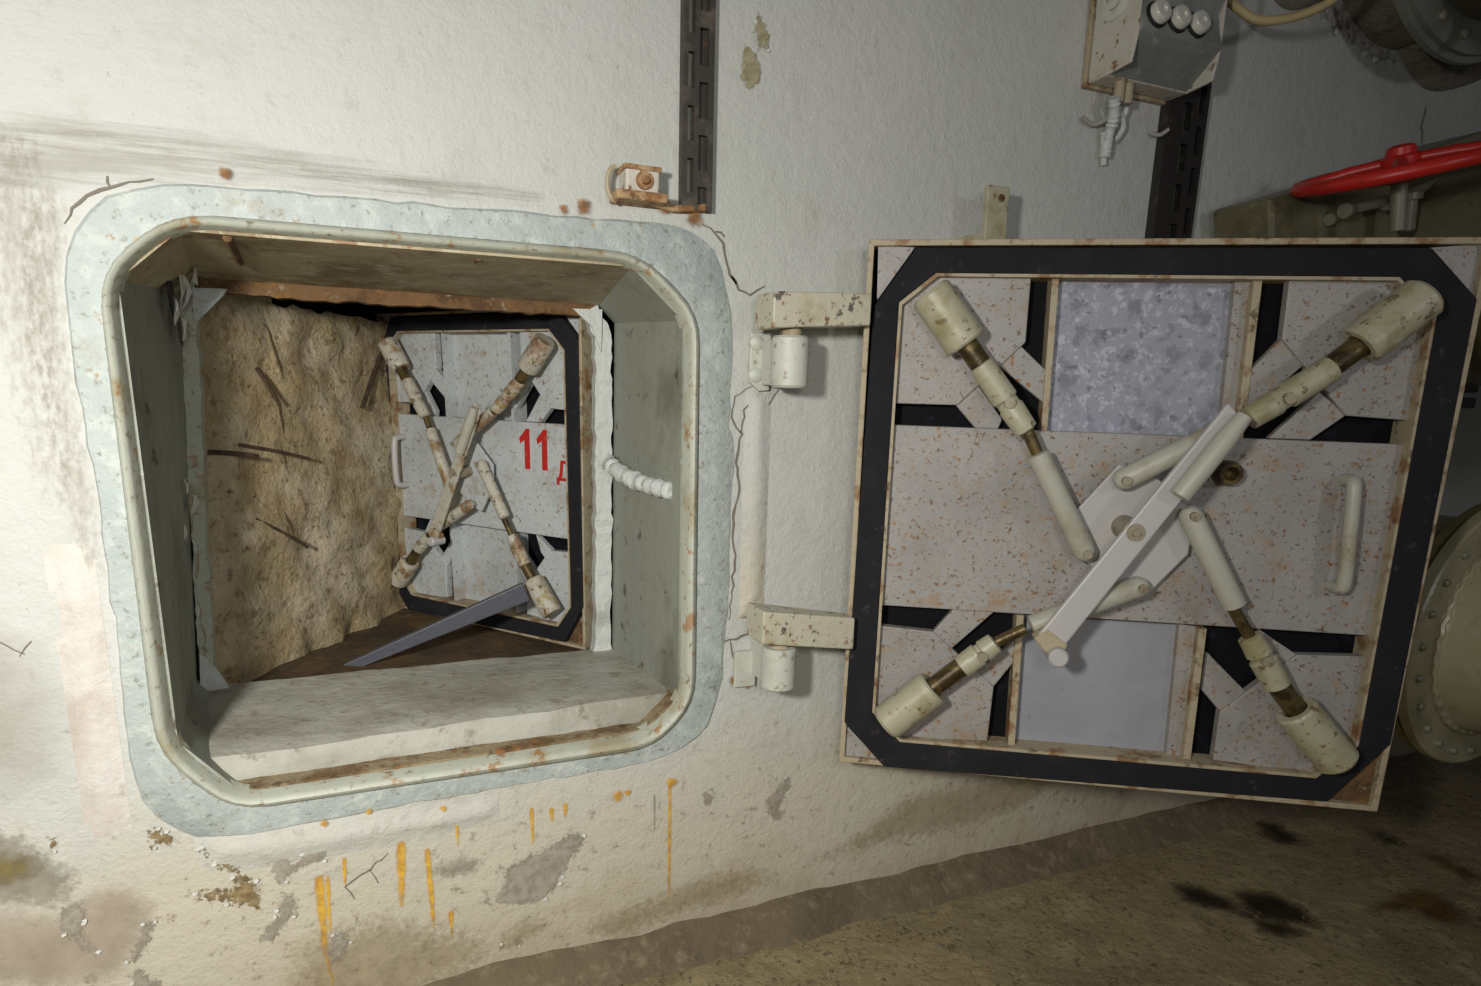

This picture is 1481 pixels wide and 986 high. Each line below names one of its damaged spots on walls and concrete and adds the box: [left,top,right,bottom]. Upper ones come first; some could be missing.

peeling [740,12,770,89]
crack [64,176,154,224]
rust [560,199,590,213]
crack [702,224,765,296]
crack [724,386,779,658]
spalling [765,777,791,821]
water stain [0,839,66,903]
peeling [192,845,327,943]
rust [315,858,346,985]
rust [397,842,405,905]
rust [425,849,453,934]
spalling [485,831,586,906]